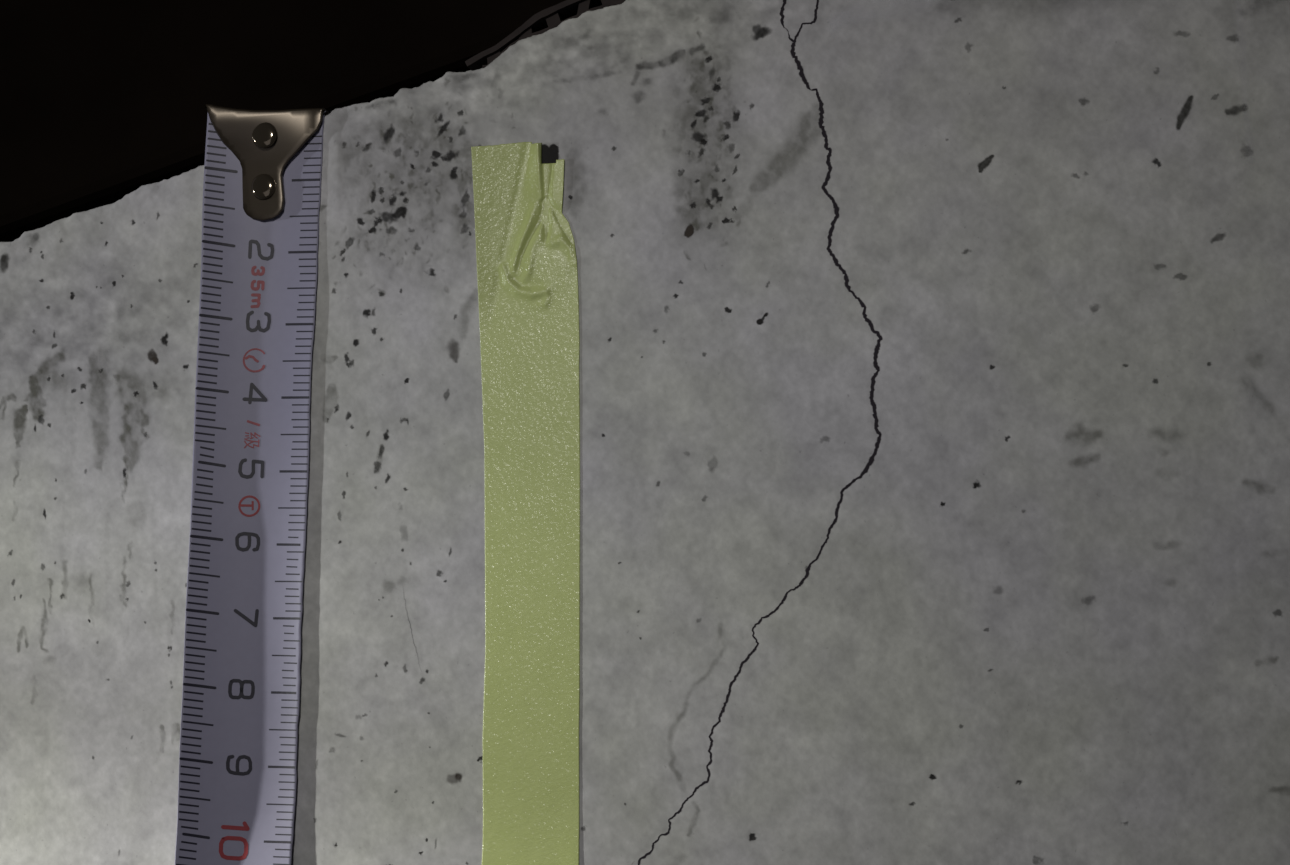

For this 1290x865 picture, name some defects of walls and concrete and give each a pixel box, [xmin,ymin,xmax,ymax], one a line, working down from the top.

damp [15,366,47,428]
crack [638,0,882,865]